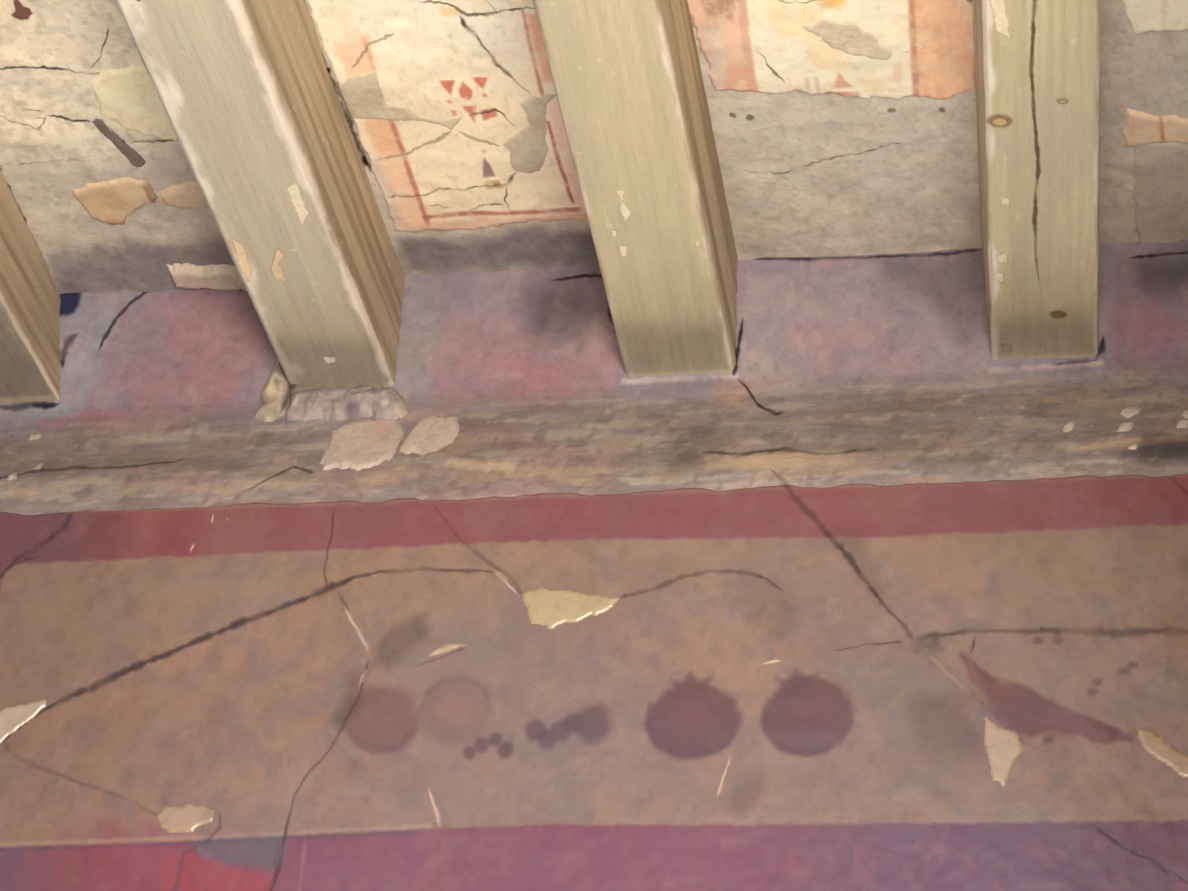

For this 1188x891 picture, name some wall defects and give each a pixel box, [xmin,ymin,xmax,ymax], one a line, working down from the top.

crack [3,29,109,74]
crack [353,34,393,67]
crack [426,0,535,76]
crack [25,109,91,122]
crack [378,109,507,160]
crack [392,176,513,205]
crack [828,534,880,600]
spalling [521,587,620,629]
crack [17,579,368,730]
spalling [0,700,46,744]
spalling [983,716,1023,787]
spalling [1136,727,1188,777]